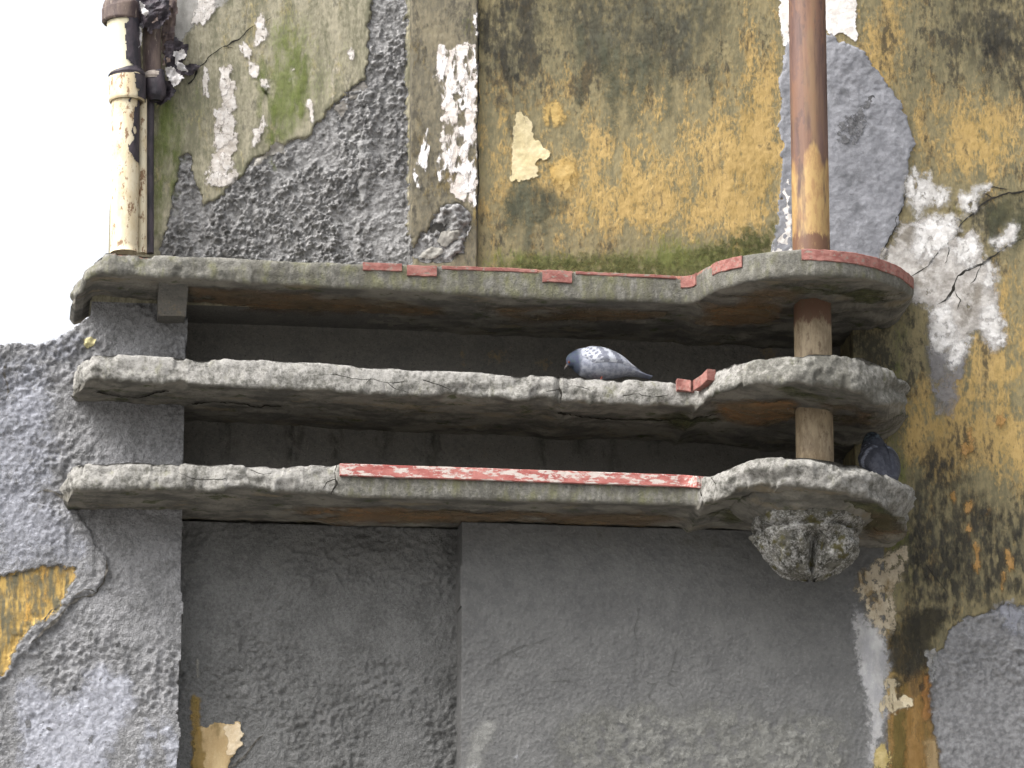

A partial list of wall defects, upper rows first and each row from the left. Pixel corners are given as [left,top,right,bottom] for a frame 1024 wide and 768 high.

crack [188,18,270,84]
water stain [555,0,718,111]
peeling [826,0,858,41]
flaking render [159,0,478,265]
peeling [509,99,578,191]
water stain [504,182,566,248]
crack [912,186,1024,310]
water stain [988,200,1024,242]
water stain [886,427,1024,682]
peeling [190,695,244,768]
peeling [853,545,914,768]
flaking render [924,600,1024,768]